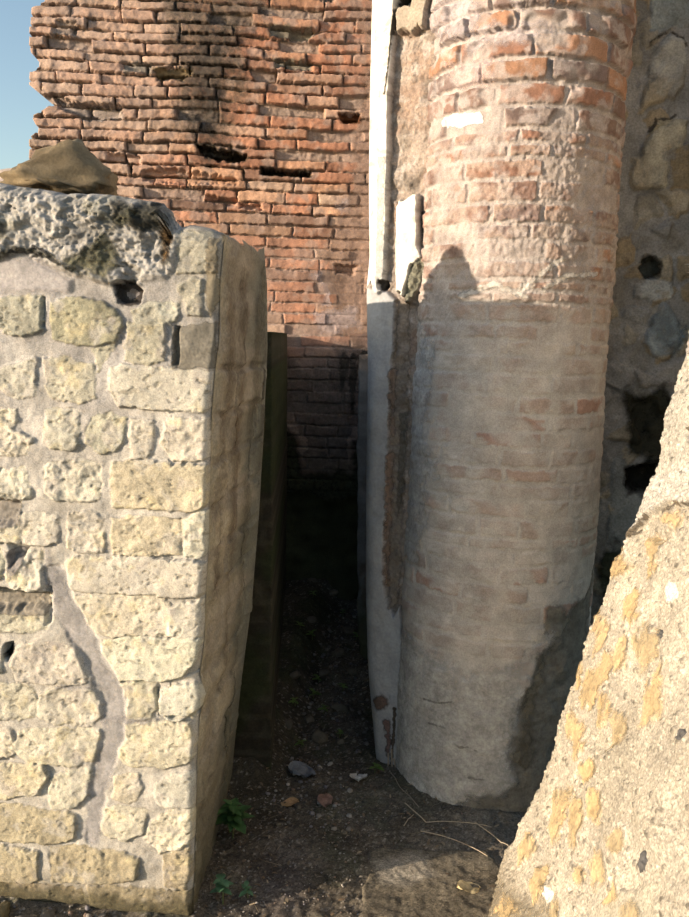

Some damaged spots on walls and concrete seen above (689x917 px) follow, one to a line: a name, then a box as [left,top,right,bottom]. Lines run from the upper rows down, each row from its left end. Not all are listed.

spalling [196,143,248,163]
spalling [260,166,312,179]
spalling [114,280,144,306]
water stain [287,350,368,459]
flaking render [382,298,440,610]
rust [373,695,391,757]